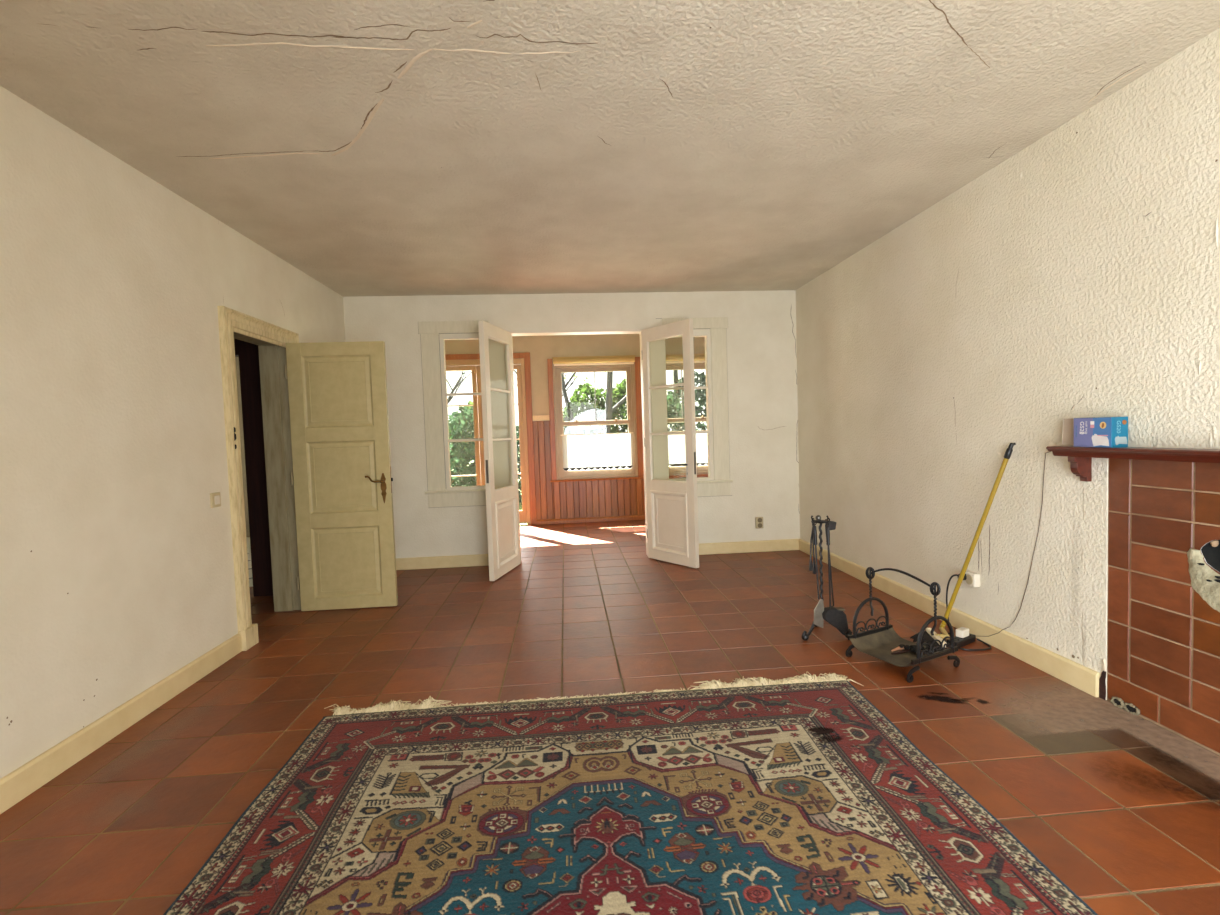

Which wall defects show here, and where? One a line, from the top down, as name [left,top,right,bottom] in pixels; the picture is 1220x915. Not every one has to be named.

crack [129,0,595,159]
crack [929,0,990,68]